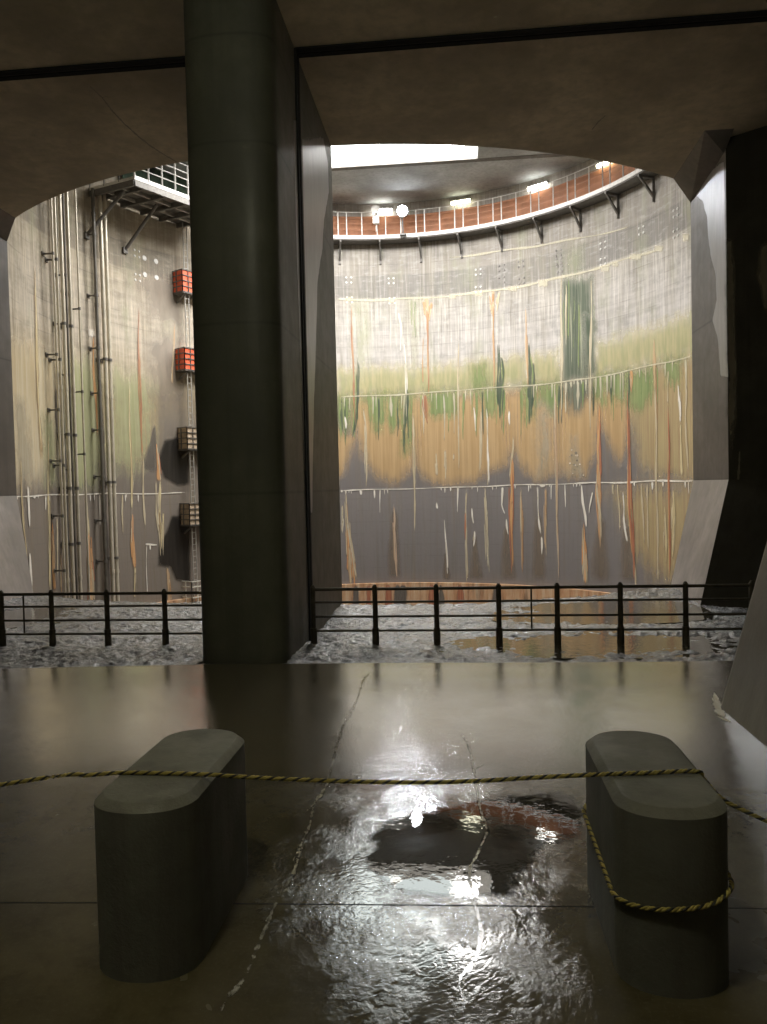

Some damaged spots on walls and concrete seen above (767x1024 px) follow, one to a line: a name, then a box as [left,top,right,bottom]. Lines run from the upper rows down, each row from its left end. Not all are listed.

water stain [142,279,188,325]
water stain [11,339,191,592]
corrosion [129,319,164,597]
corrosion [341,497,371,605]
water stain [338,246,693,578]
corrosion [508,439,524,573]
corrosion [582,406,606,582]
corrosion [622,371,636,585]
crack [220,674,368,1011]